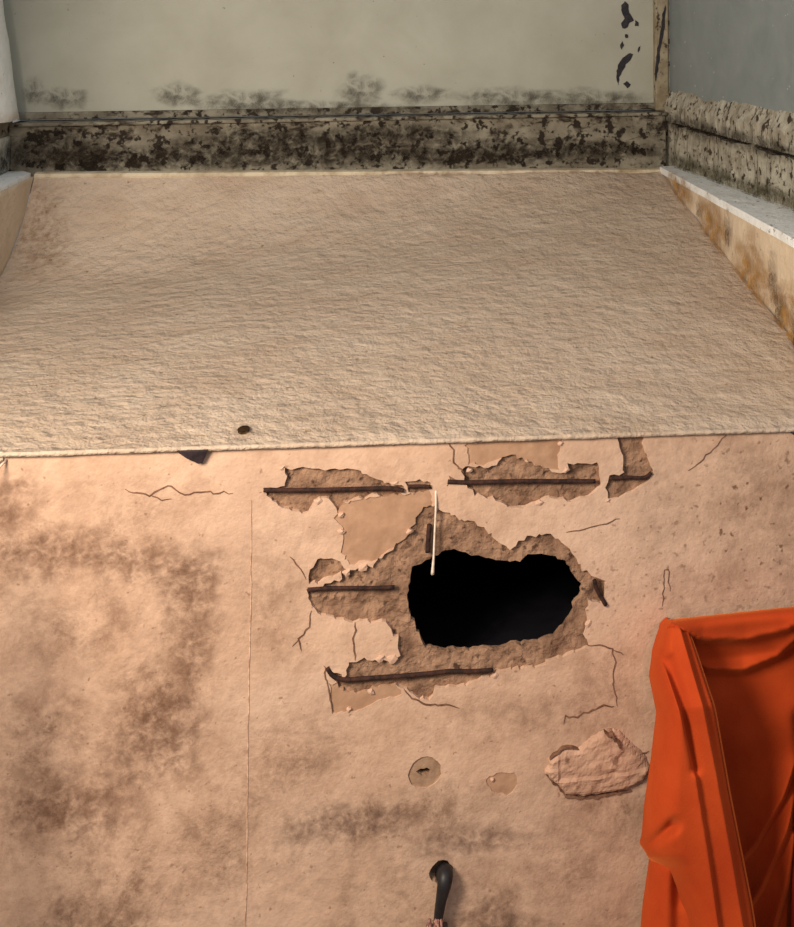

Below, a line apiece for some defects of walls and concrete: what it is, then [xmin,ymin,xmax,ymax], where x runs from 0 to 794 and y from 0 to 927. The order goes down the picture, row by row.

water stain [0,125,652,171]
spalling [447,437,653,506]
spalling [263,466,607,713]
crack [564,644,623,721]